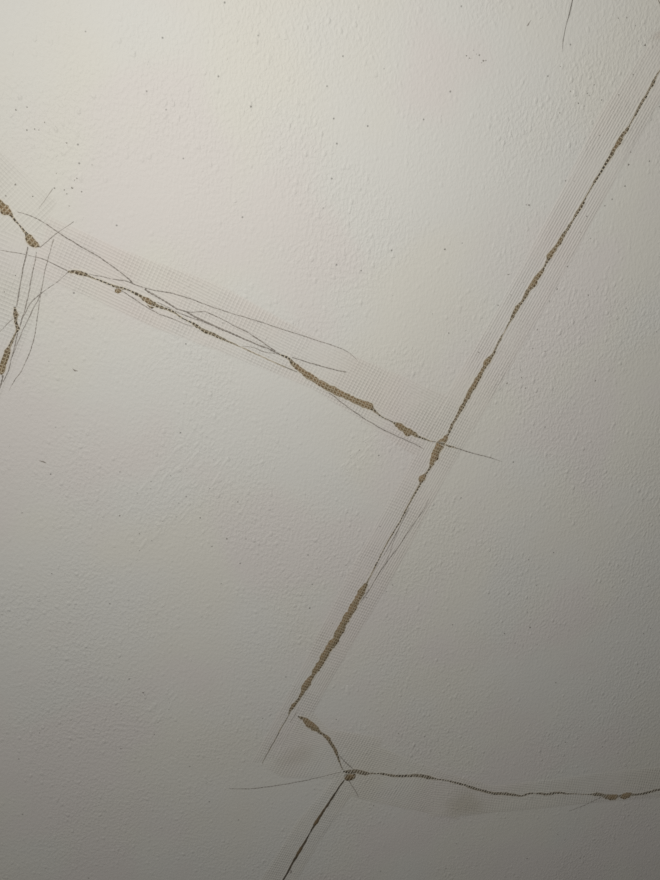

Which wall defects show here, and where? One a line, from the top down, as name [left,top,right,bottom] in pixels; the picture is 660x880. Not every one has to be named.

crack [0,69,660,764]
crack [268,715,660,880]